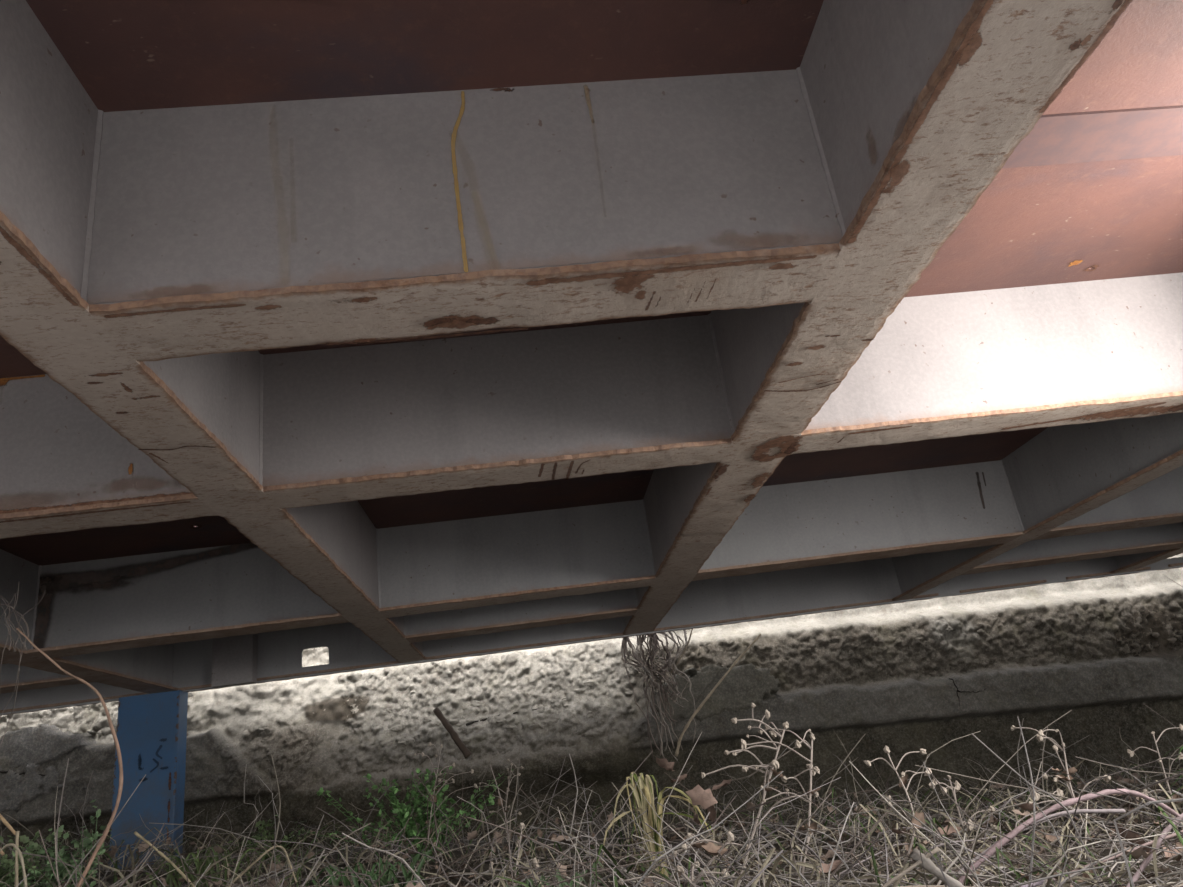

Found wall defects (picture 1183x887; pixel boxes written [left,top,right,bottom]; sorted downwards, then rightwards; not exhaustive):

rust [451,91,468,272]